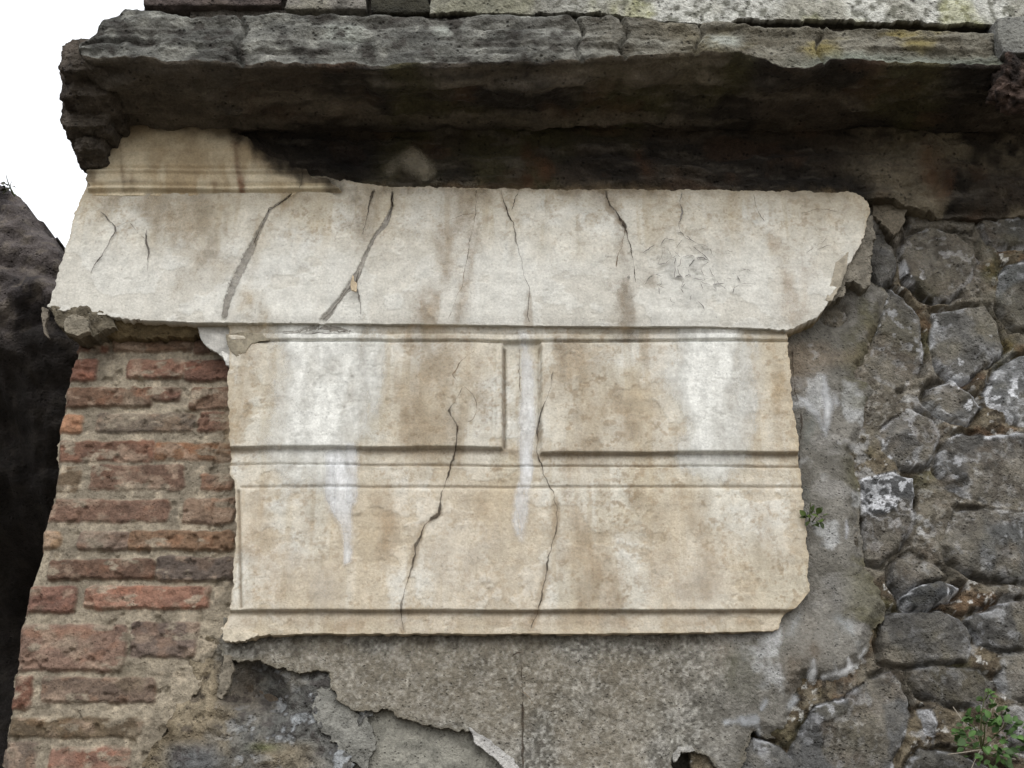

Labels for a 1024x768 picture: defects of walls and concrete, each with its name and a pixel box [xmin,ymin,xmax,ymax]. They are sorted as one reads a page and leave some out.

crack [91,213,150,272]
crack [222,172,303,318]
crack [283,190,393,334]
crack [450,191,530,320]
crack [605,192,751,308]
leakage [271,325,383,562]
crack [400,359,477,625]
leakage [518,336,534,514]
crack [518,349,558,627]
spalling [142,627,519,768]